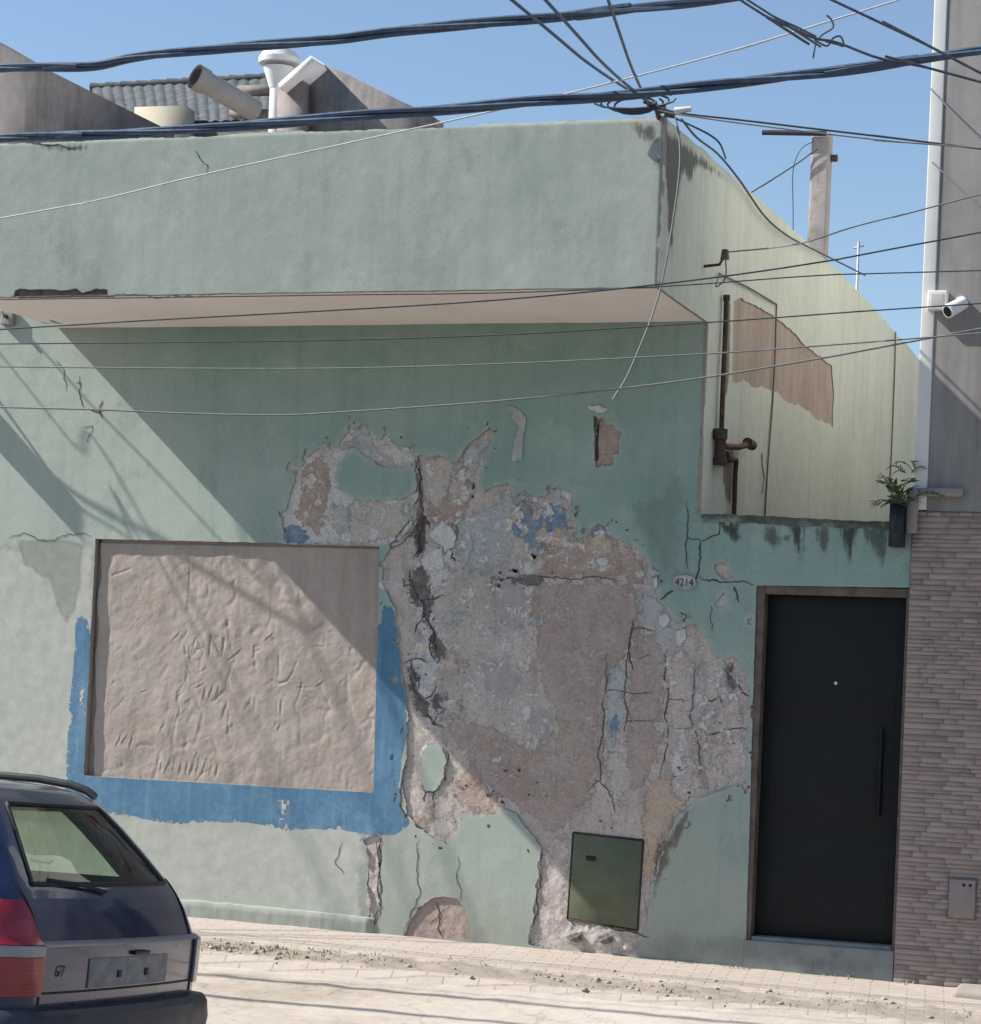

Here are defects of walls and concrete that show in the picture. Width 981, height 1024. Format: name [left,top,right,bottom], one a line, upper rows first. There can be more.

leakage [666,134,712,245]
spalling [16,289,111,299]
crack [57,362,103,443]
spalling [588,405,622,468]
flaking render [732,298,833,426]
crack [685,501,752,631]
leakage [721,522,738,540]
leakage [791,527,800,548]
leakage [843,528,886,558]
crack [389,459,462,936]
flaking render [279,422,751,957]
crack [584,621,749,812]